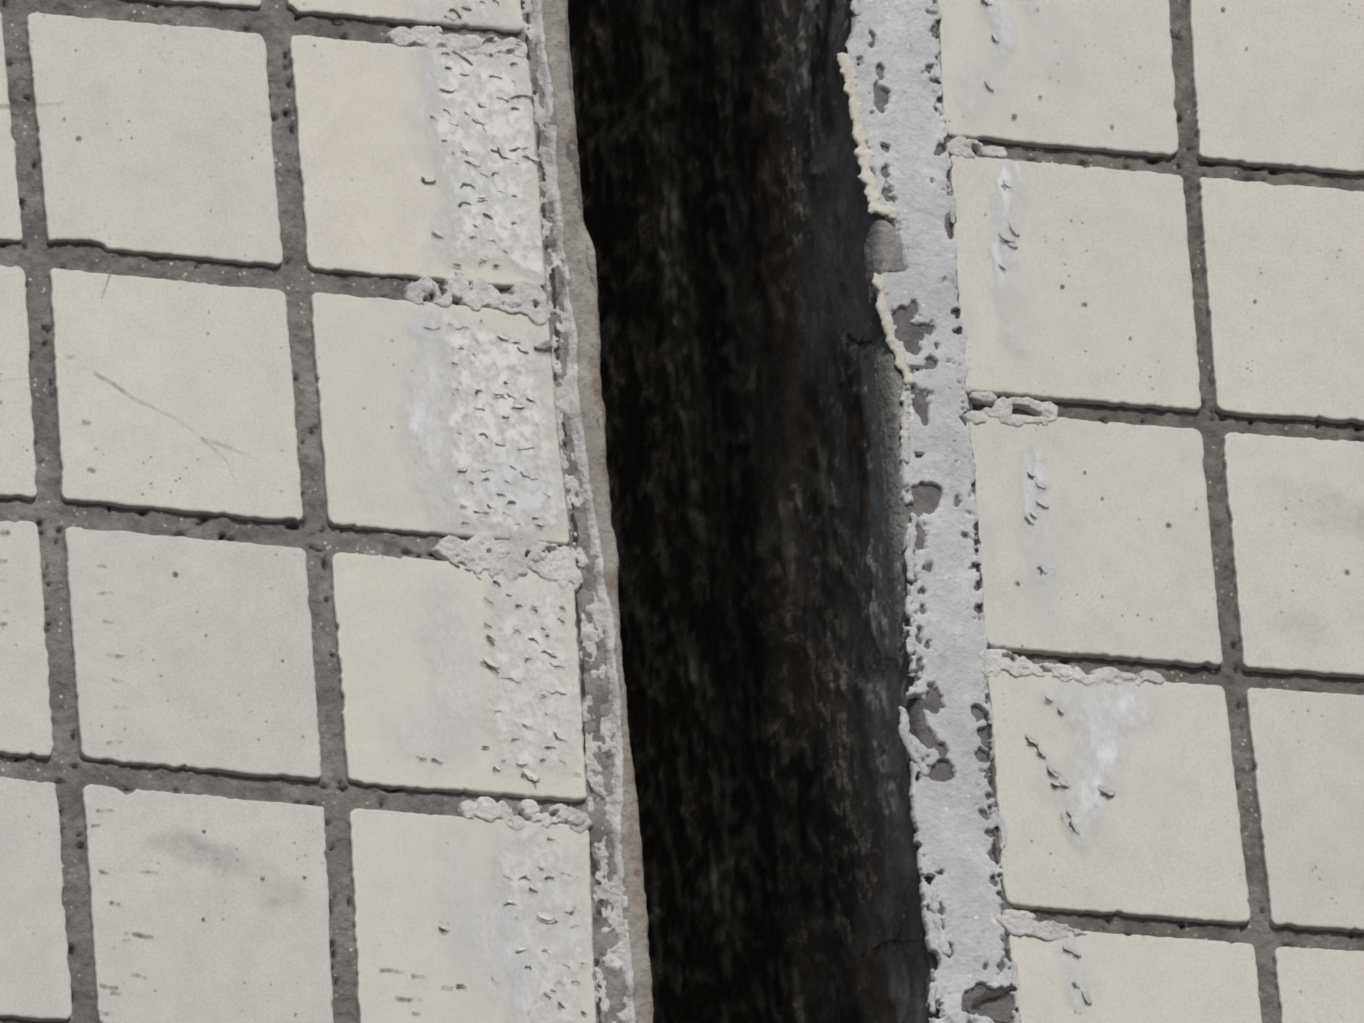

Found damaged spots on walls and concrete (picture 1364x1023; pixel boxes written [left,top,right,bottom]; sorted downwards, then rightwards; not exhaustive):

peeling [421,0,637,1023]
crack [517,0,560,380]
crack [559,412,593,793]
crack [847,334,872,346]
peeling [789,0,1021,1023]
peeling [1024,470,1049,525]
crack [590,839,604,916]
crack [594,958,602,1023]